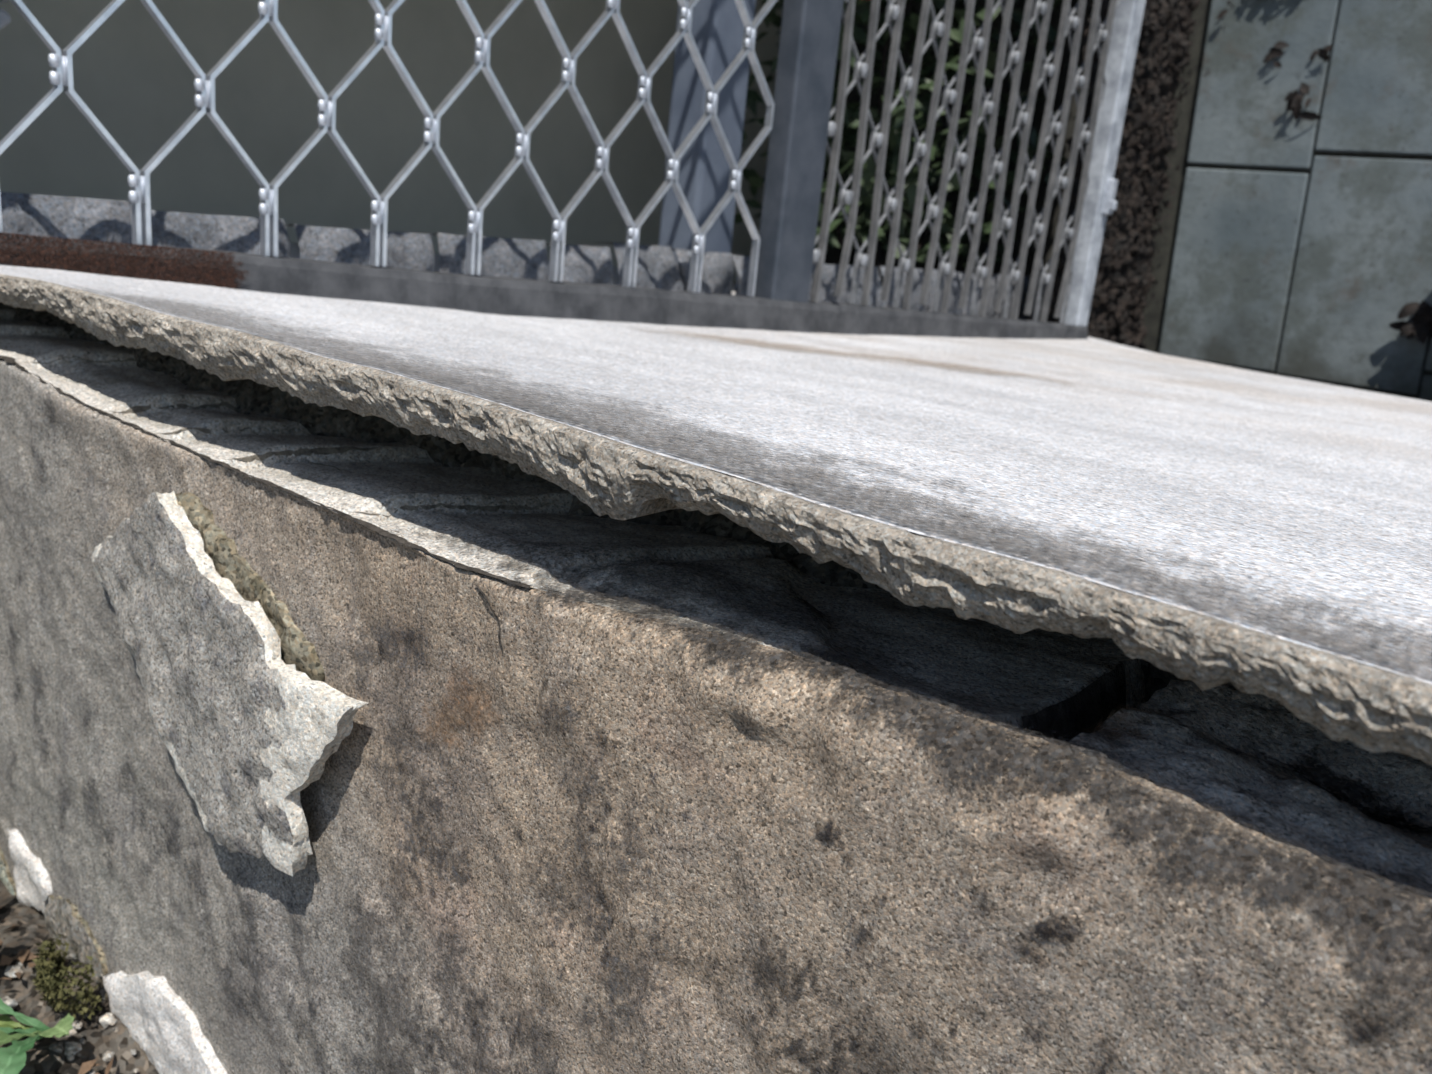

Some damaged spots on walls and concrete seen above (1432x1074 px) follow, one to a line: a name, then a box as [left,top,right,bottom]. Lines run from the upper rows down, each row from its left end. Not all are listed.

rust [0,232,247,289]
crack [0,302,883,656]
crack [1021,628,1184,741]
water stain [423,532,1432,1058]
water stain [776,1000,914,1074]